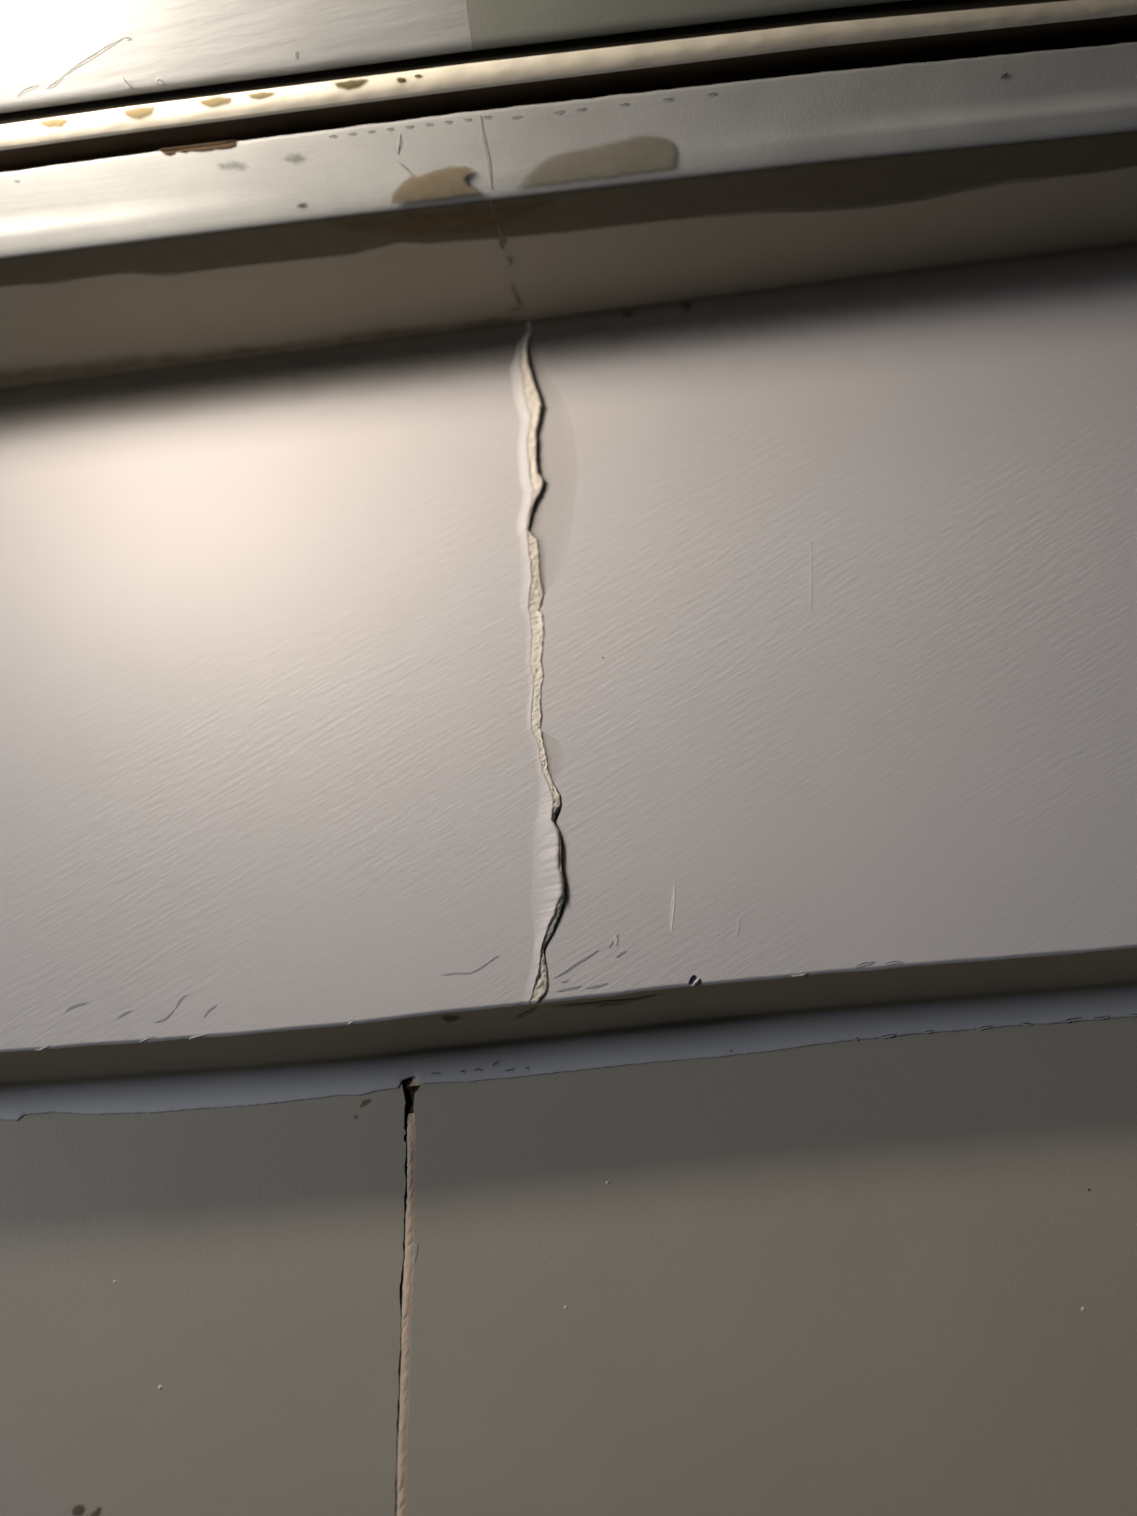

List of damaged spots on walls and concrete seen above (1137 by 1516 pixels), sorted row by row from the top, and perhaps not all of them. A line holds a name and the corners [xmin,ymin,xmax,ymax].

peeling [391,166,480,204]
peeling [519,137,676,188]
crack [443,240,663,1020]
crack [395,1060,530,1516]